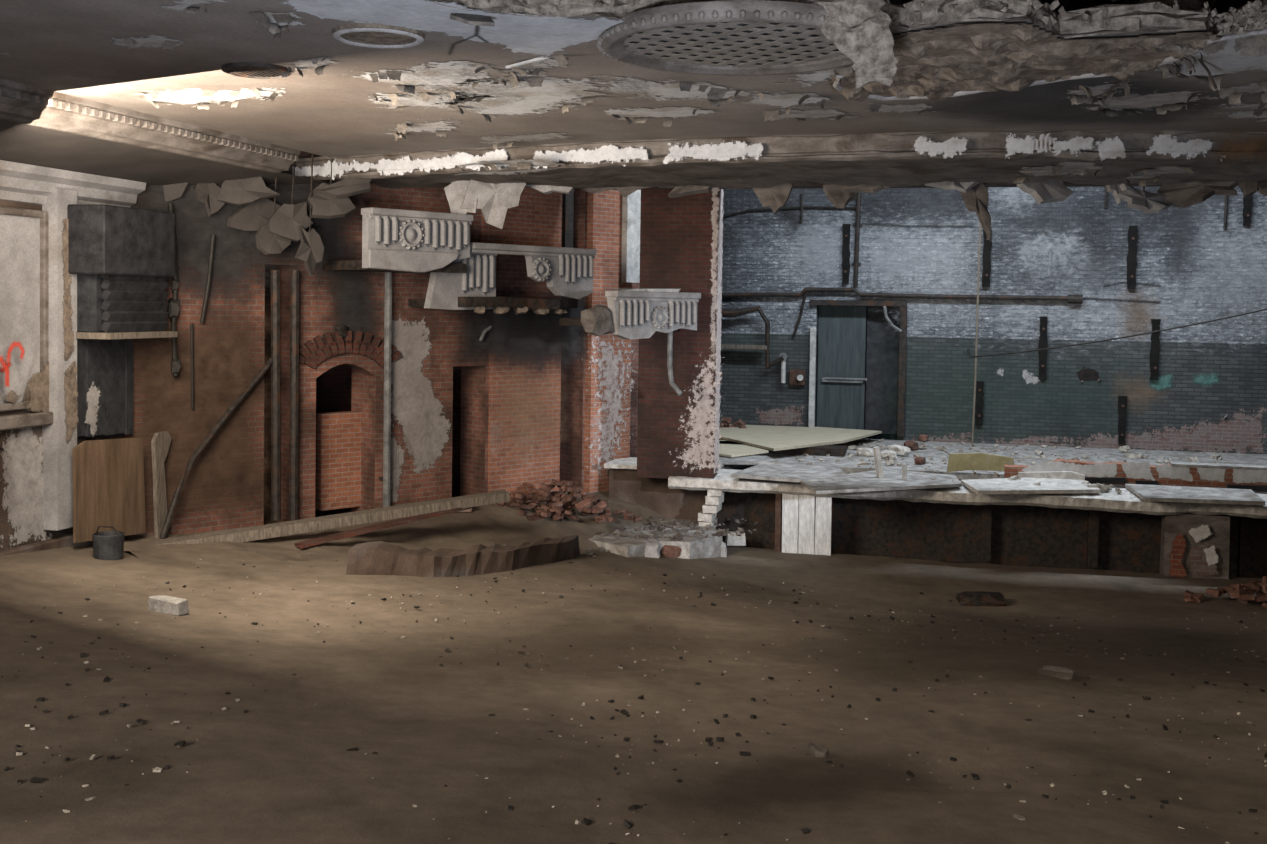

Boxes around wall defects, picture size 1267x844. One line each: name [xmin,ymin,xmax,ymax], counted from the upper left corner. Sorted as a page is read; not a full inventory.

peeling [103,33,185,50]
spalling [137,0,1267,187]
spalling [0,362,49,412]
peeling [0,427,53,549]
spalling [61,218,101,443]
flaking render [390,314,451,503]
peeling [474,304,638,479]
peeling [668,187,725,475]